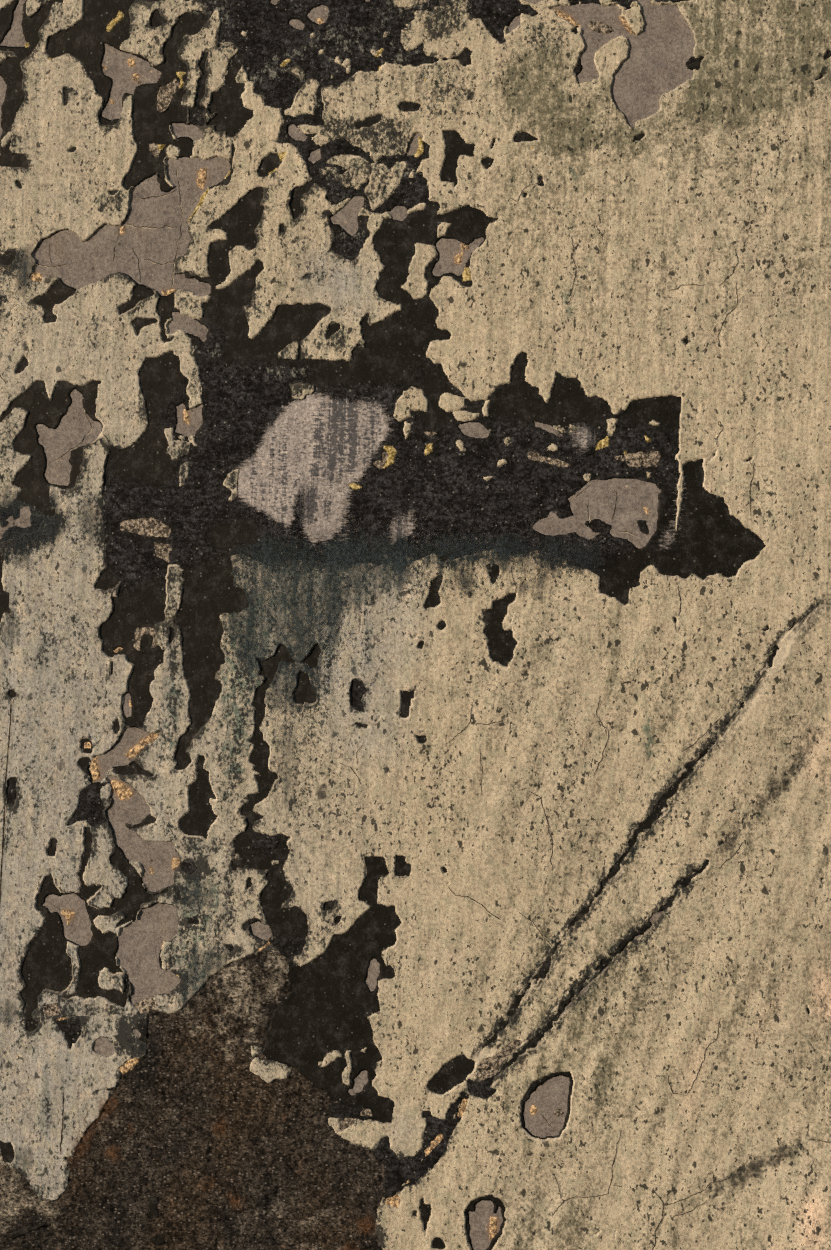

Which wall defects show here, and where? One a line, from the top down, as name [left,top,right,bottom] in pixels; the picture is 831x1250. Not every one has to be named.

peeling [0,0,766,770]
water stain [231,538,416,708]
crack [673,588,681,632]
crack [593,696,610,776]
crack [529,790,554,871]
spalling [571,716,730,926]
spalling [0,596,590,1250]
crack [448,888,552,947]
spalling [594,896,676,974]
crack [666,1021,720,1096]